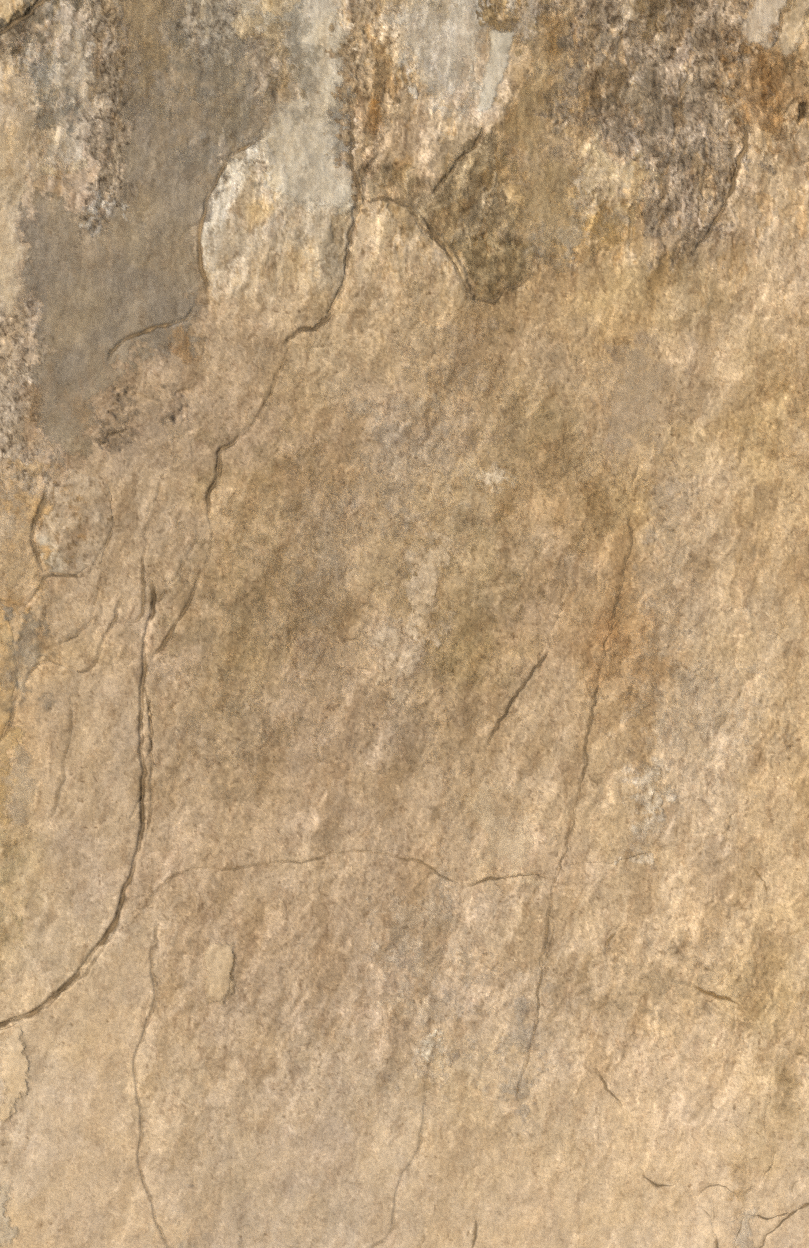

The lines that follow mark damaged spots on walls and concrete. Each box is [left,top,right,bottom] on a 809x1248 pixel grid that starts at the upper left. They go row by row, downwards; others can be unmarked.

crack [198,141,256,281]
crack [111,319,187,353]
crack [206,442,235,506]
crack [614,518,632,615]
crack [579,649,605,792]
crack [0,561,193,1027]
crack [517,908,550,1091]